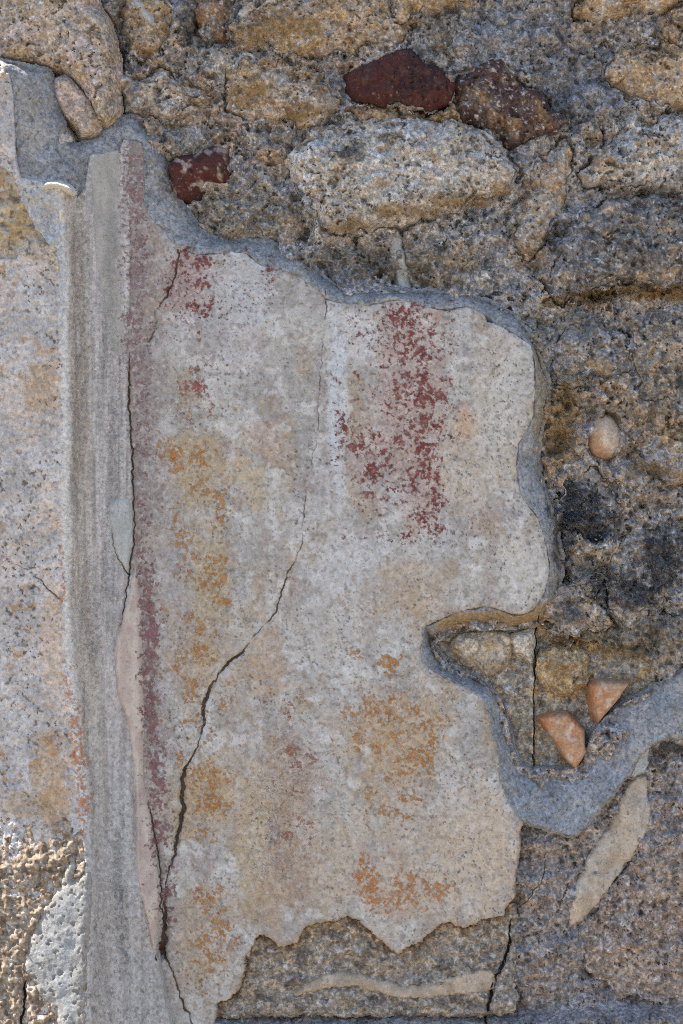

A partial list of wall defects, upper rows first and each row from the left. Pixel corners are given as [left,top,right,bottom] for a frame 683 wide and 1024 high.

crack [112,358,136,625]
peeling [117,143,248,928]
peeling [330,300,460,545]
damp [547,480,618,575]
damp [592,528,683,611]
crack [148,498,306,1024]
peeling [281,744,325,775]
peeling [333,650,456,827]
flaking render [437,624,658,766]
flaking render [186,852,520,1019]